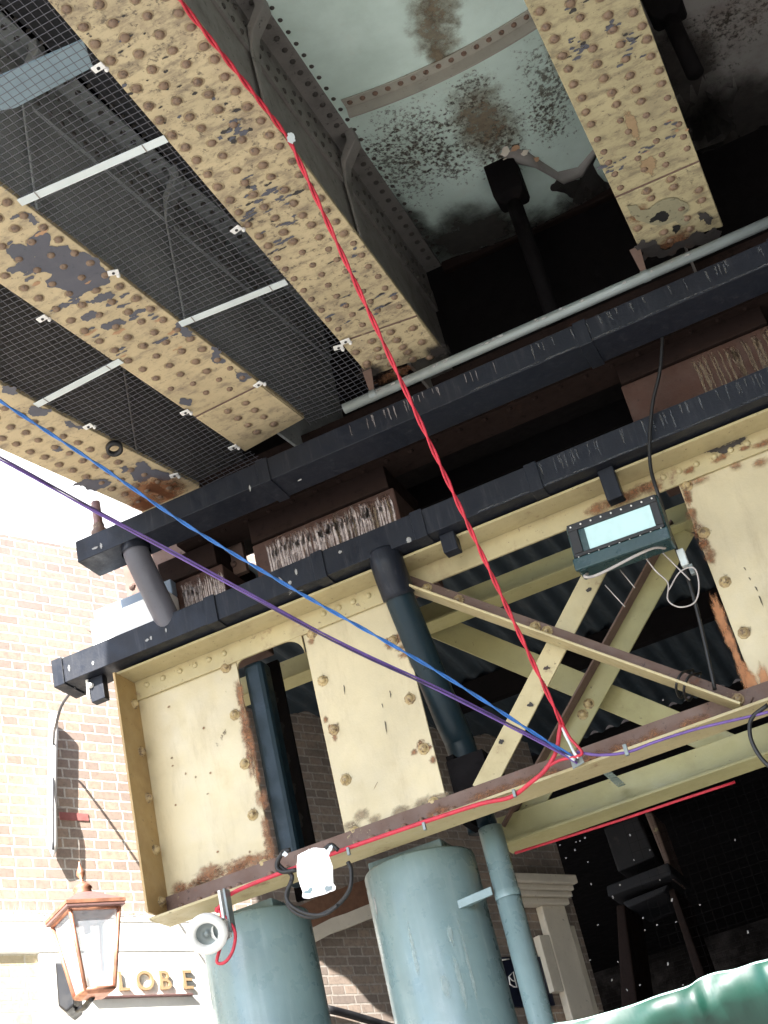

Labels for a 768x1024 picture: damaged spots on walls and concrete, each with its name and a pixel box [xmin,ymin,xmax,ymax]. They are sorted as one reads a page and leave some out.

peeling [212,97,253,144]
damp [441,70,523,171]
peeling [6,212,160,338]
peeling [235,174,304,256]
peeling [635,211,722,261]
peeling [72,479,112,491]
peeling [120,461,171,483]
rust [128,479,184,511]
rust [682,466,714,563]
rust [714,440,768,468]
rust [713,600,768,688]
rust [174,683,274,893]